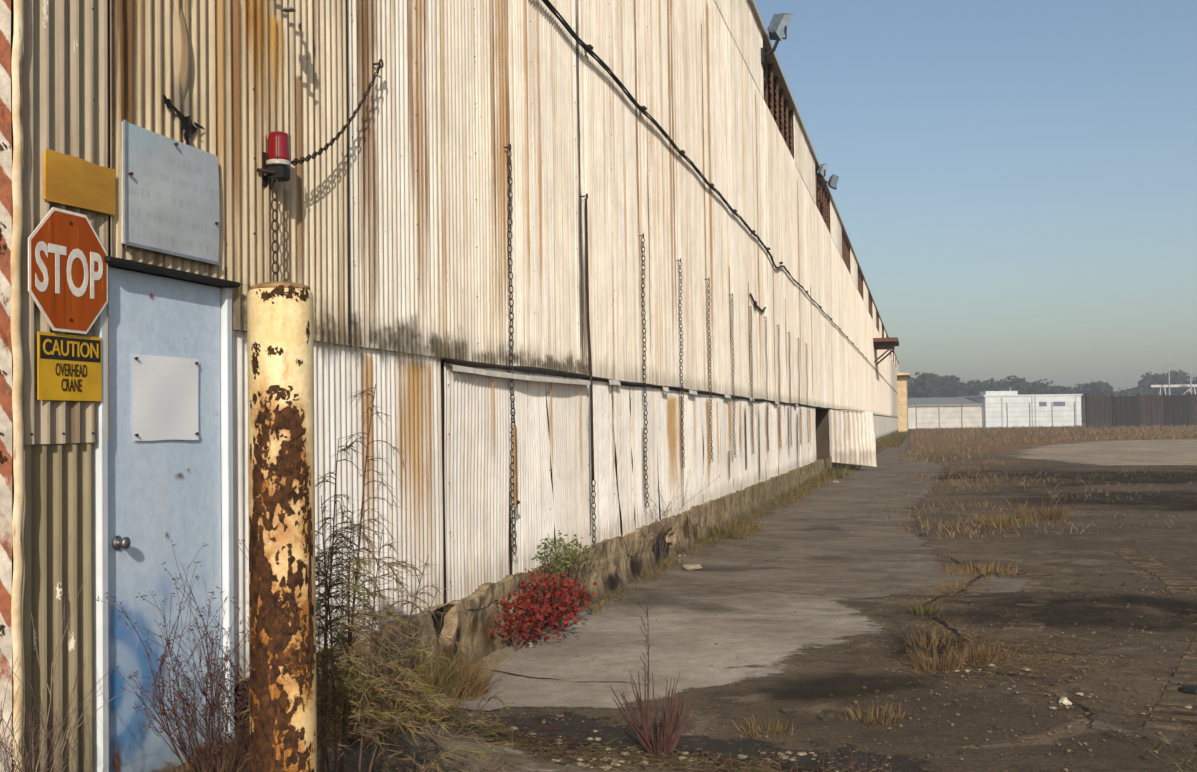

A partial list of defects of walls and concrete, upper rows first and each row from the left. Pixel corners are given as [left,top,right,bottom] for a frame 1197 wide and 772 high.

rust [362,357,372,480]
rust [400,364,431,491]
spalling [652,532,686,563]
crack [876,553,1156,753]